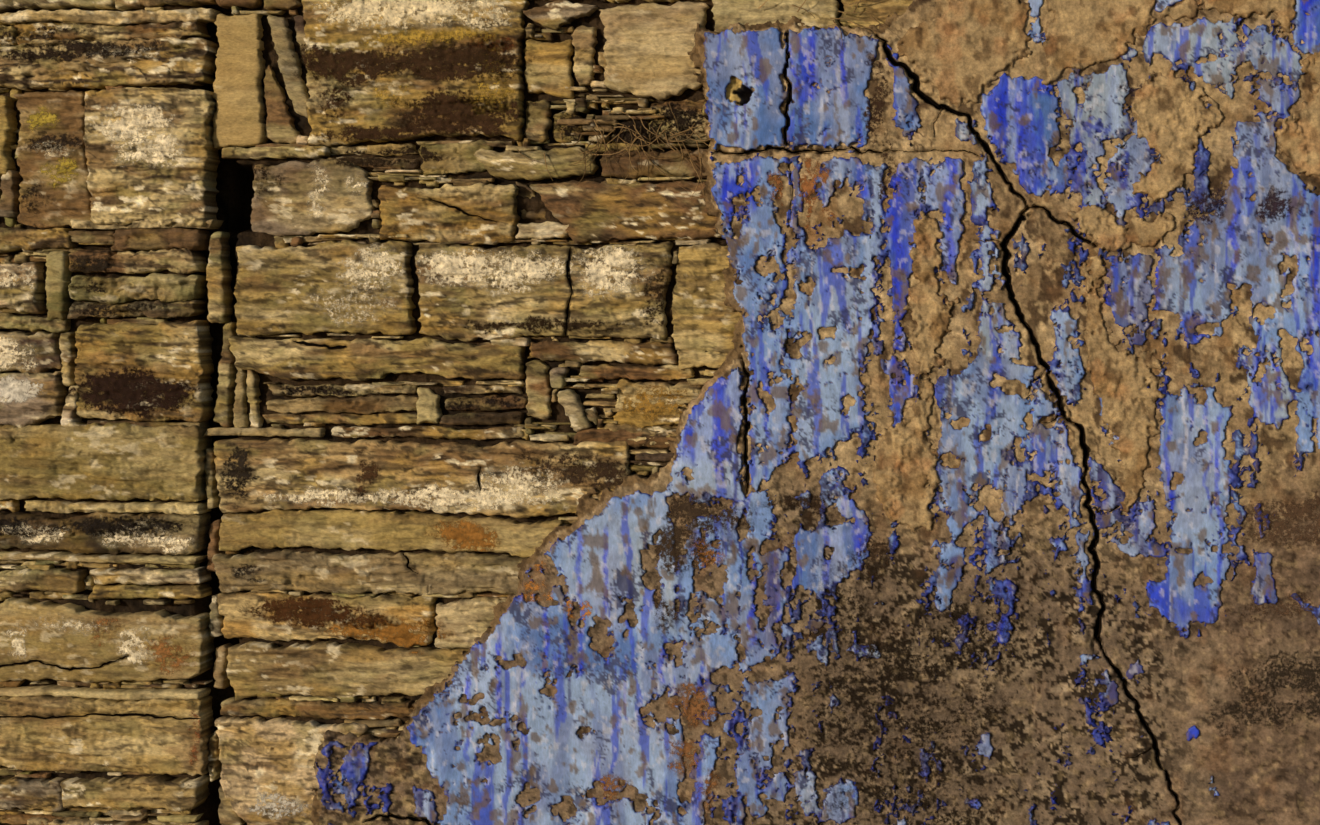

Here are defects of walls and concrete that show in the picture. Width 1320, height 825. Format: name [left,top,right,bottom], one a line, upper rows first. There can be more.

spalling [231,6,299,16]
spalling [255,135,325,147]
spalling [274,200,494,249]
peeling [312,0,1320,825]
crack [712,34,1182,825]
spalling [257,692,405,704]
crack [365,814,431,825]